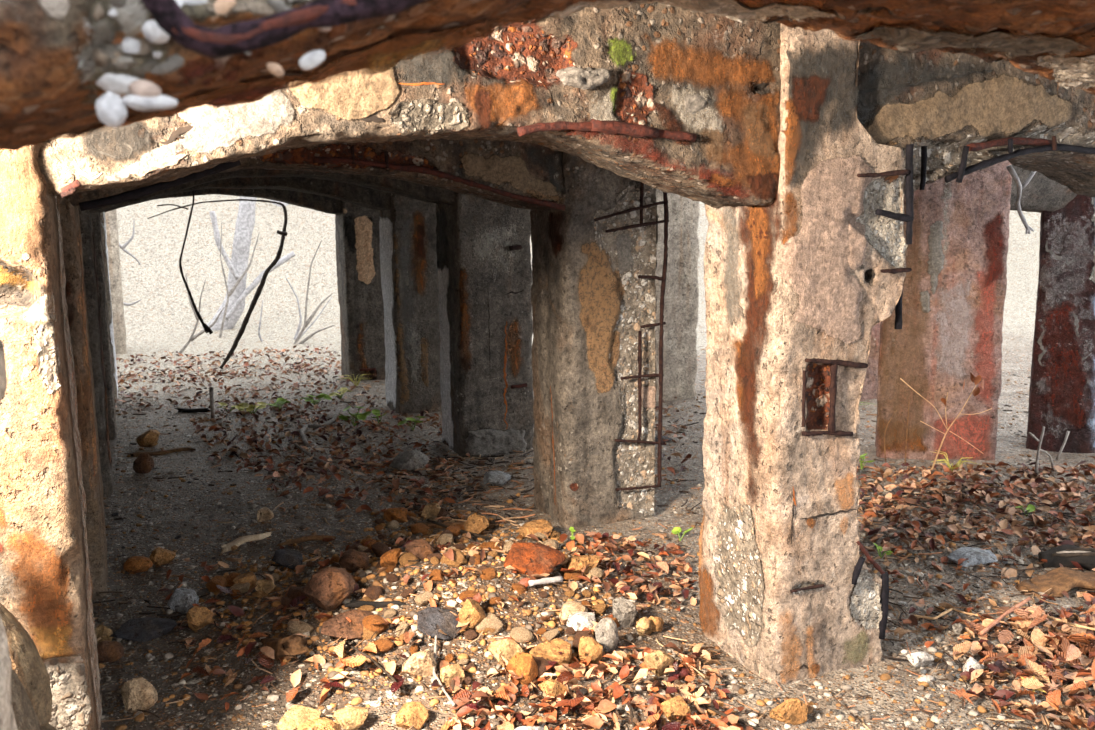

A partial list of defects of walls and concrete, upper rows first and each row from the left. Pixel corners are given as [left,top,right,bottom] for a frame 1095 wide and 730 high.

spalling [0,261,61,394]
rust [548,212,564,258]
spalling [578,186,656,517]
rust [567,40,797,502]
spalling [801,358,868,436]
rust [878,202,991,460]
peeling [780,26,1095,344]
rust [976,213,1005,402]
rust [1043,302,1087,428]
rust [0,510,72,658]